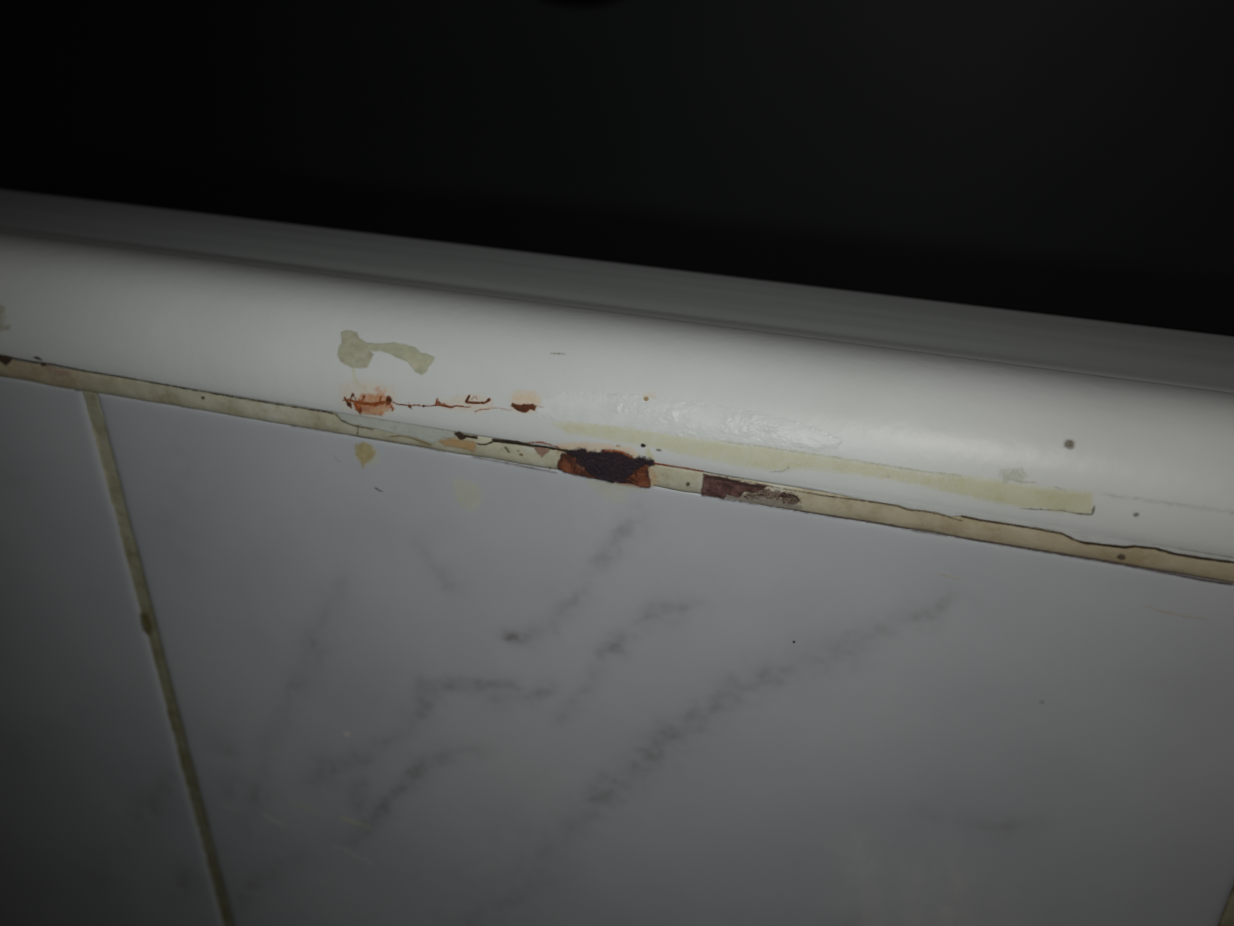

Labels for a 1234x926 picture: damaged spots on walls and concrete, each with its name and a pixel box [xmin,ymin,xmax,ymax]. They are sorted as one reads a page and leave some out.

peeling [337,330,435,388]
corrosion [491,388,543,414]
corrosion [504,441,801,509]
damp [551,420,1234,516]
crack [702,470,1234,585]